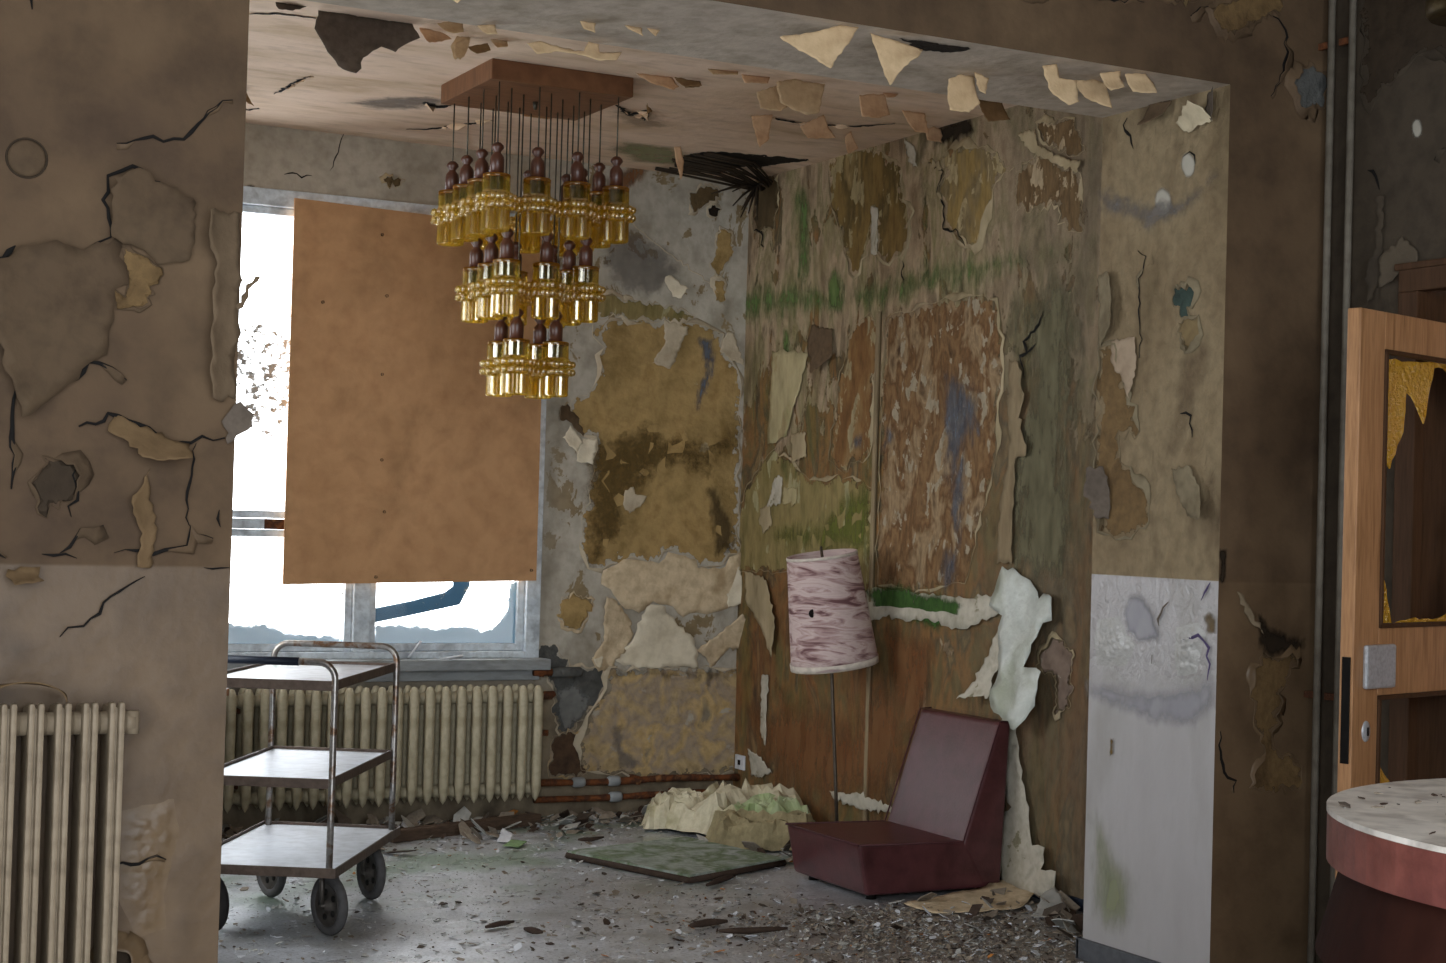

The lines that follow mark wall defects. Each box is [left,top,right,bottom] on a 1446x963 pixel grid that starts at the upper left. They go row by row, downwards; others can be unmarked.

peeling [275,2,508,73]
crack [0,245,16,258]
crack [9,391,23,489]
crack [43,361,231,637]
crack [95,76,313,243]
damp [587,431,730,559]
damp [697,339,714,408]
spalling [655,146,808,304]
flaking render [636,25,1213,280]
flaking render [1083,272,1151,541]
flaking render [1171,276,1203,354]
flaking render [539,275,1075,896]